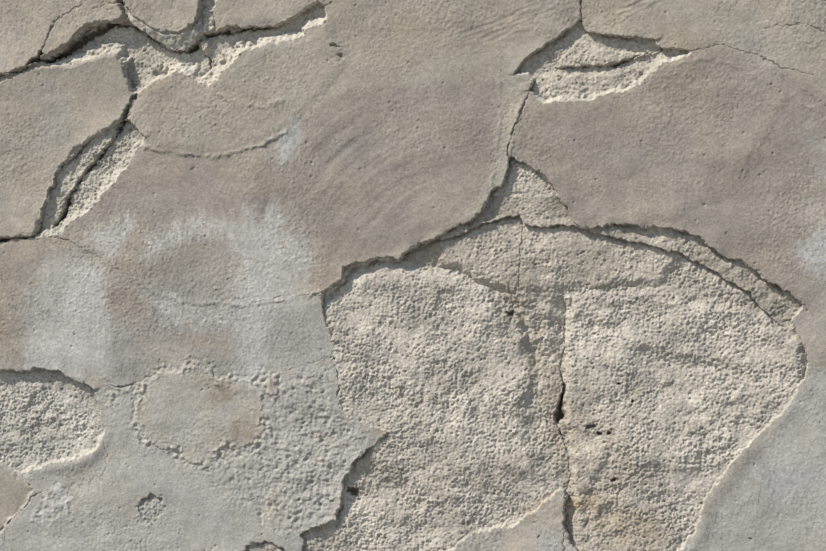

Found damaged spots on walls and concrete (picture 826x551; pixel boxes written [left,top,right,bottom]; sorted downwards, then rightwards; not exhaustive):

crack [0,0,271,77]
spalling [44,0,328,95]
spalling [514,20,692,104]
crack [0,94,145,285]
spalling [34,119,145,239]
crack [507,89,532,158]
spalling [0,367,105,535]
spalling [130,157,809,551]
crack [554,294,572,494]